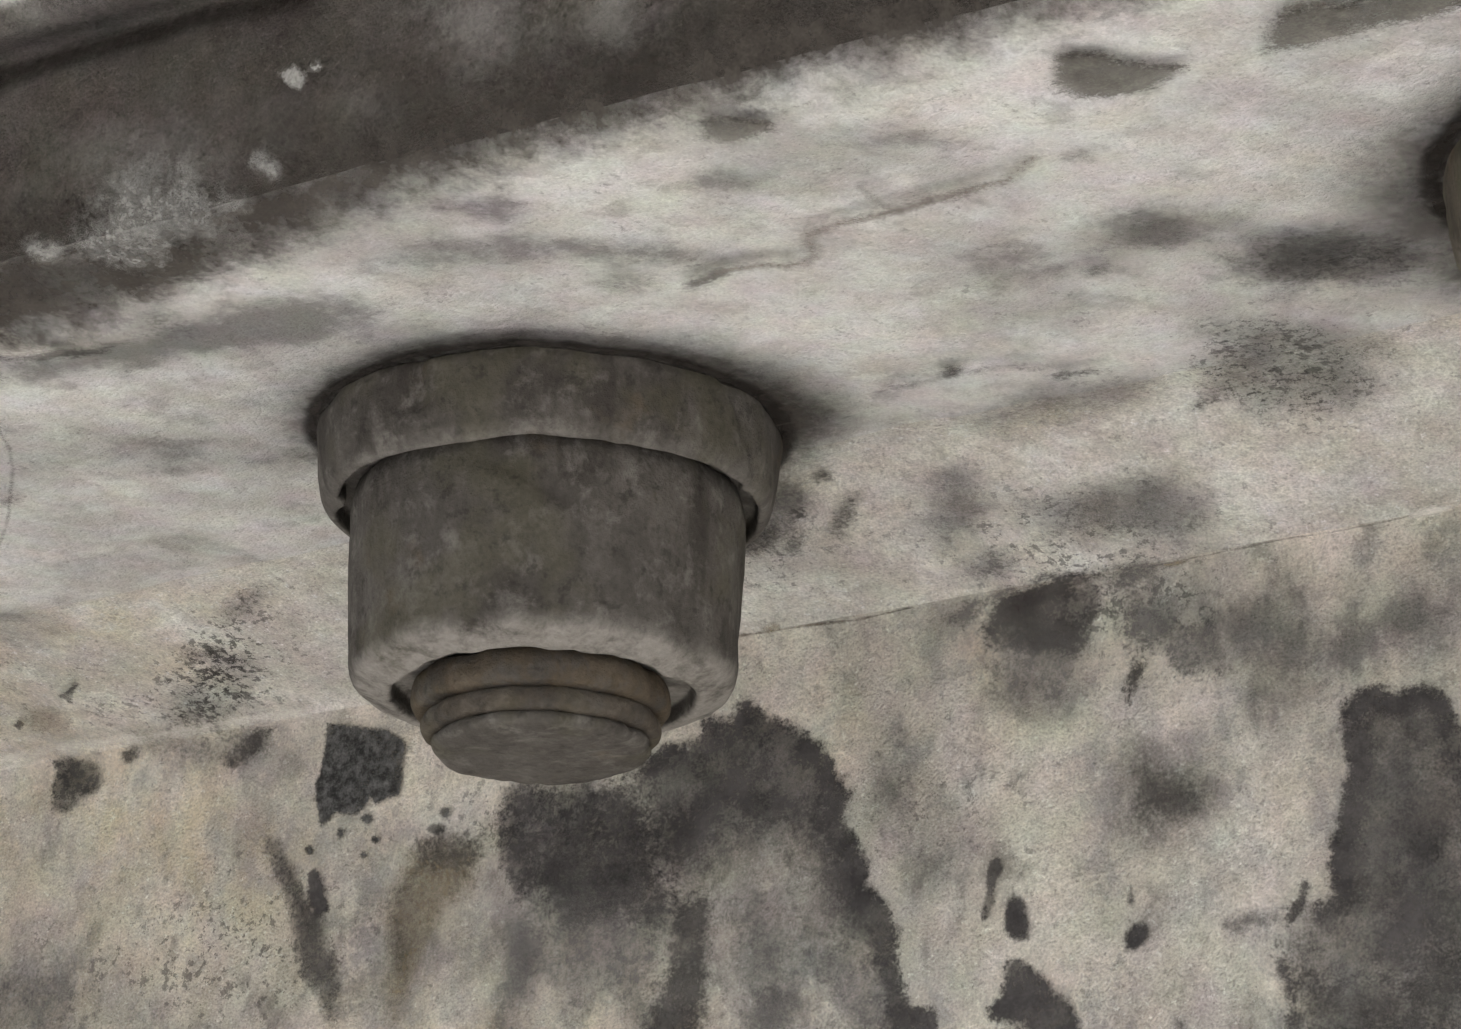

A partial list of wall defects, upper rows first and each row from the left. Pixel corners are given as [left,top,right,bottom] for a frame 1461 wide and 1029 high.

crack [687,156,1035,287]
water stain [949,552,1231,709]
water stain [262,839,339,1020]
water stain [389,838,481,995]
water stain [494,697,938,1029]
water stain [981,858,1029,940]
water stain [986,959,1079,1029]
water stain [1224,682,1461,1029]